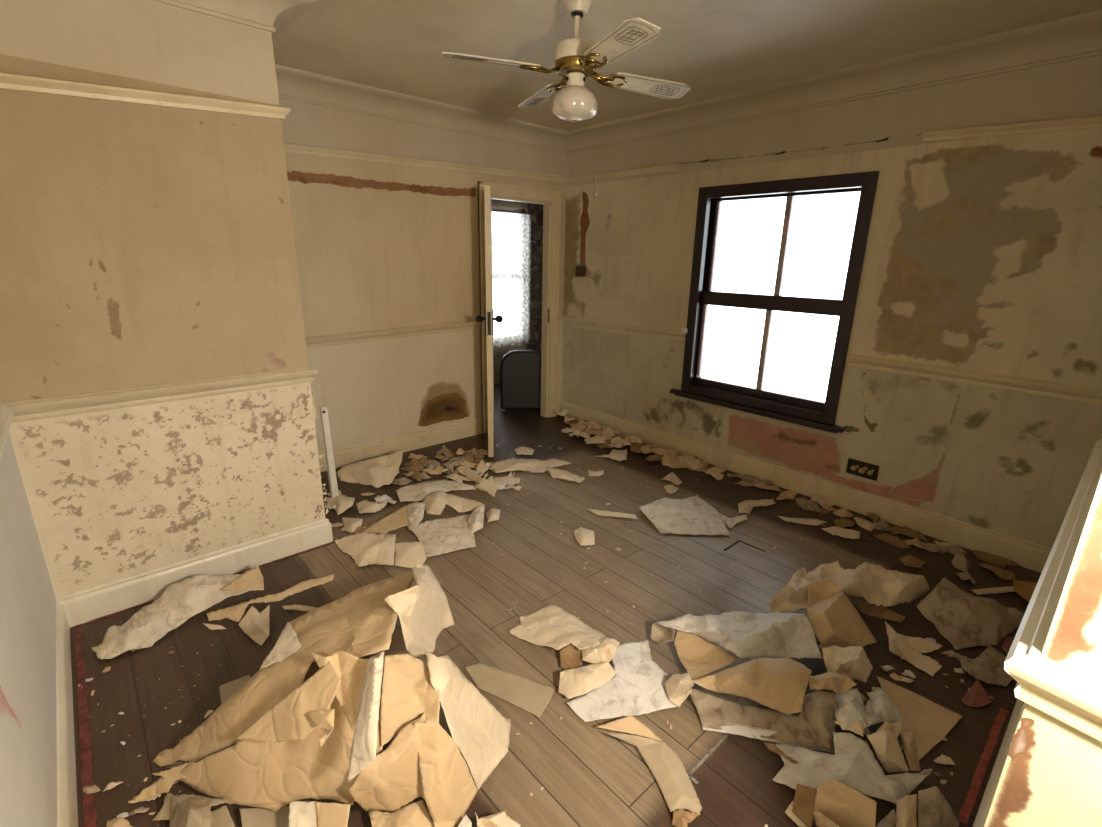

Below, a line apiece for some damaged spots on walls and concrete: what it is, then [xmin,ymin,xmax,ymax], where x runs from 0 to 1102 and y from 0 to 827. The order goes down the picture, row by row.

flaking render [287,170,477,198]
peeling [88,257,123,341]
peeling [563,188,604,319]
peeling [725,412,948,510]
flaking render [1042,475,1102,666]
flaking render [984,721,1039,827]